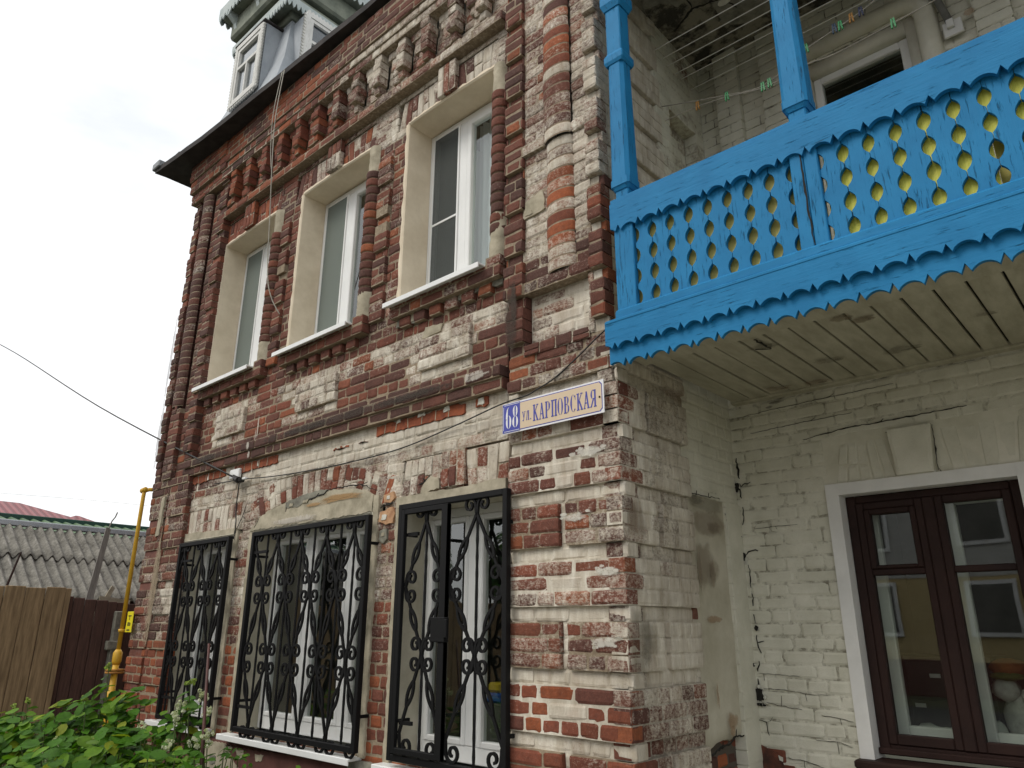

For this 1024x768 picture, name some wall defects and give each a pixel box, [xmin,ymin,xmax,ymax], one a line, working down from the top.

crack [740,383,967,471]
crack [692,458,853,768]
flaking render [761,745,785,768]